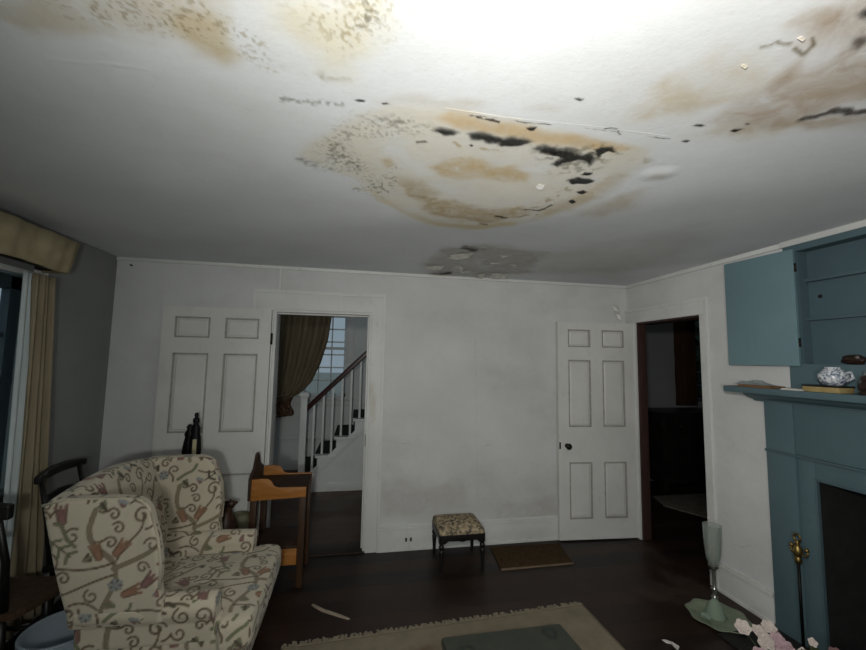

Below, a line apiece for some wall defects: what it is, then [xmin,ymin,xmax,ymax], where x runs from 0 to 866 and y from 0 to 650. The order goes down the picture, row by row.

damp [470,127,615,204]
peeling [426,248,515,279]